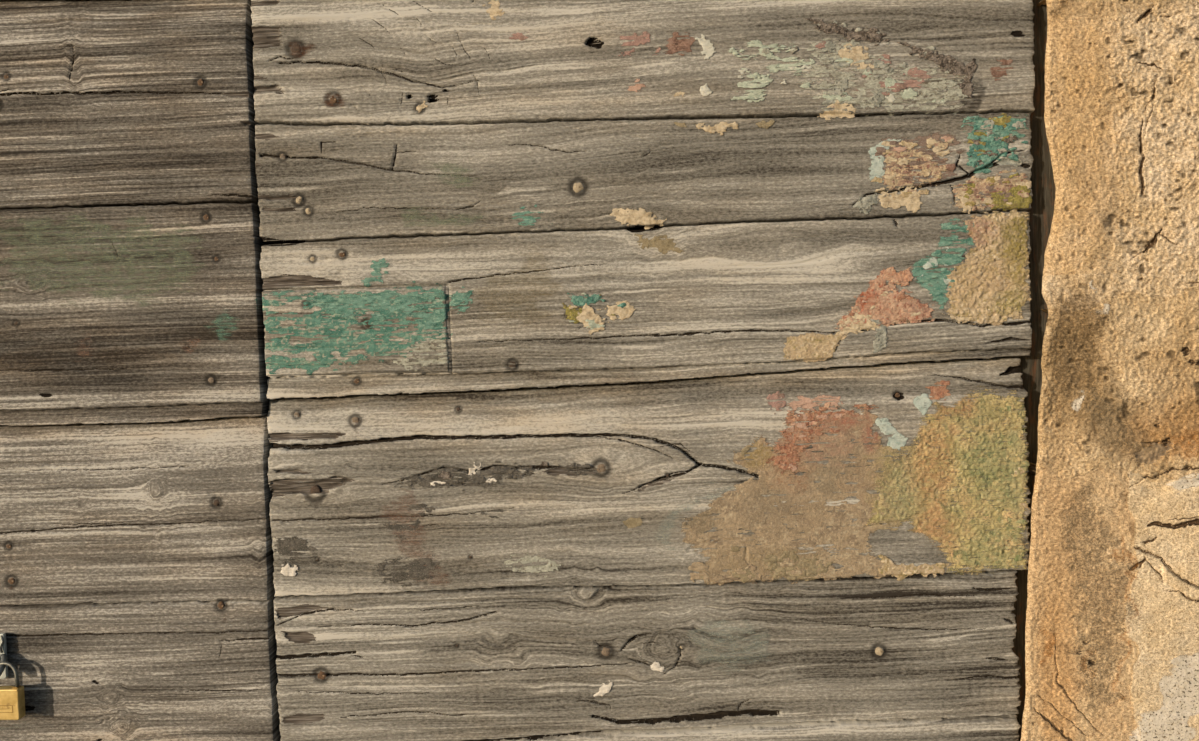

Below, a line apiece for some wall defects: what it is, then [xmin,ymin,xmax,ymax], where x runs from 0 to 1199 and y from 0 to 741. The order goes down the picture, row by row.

peeling [610,18,1032,363]
peeling [255,258,473,376]
peeling [562,293,636,335]
crack [0,433,759,534]
peeling [681,380,1030,586]
crack [1129,516,1199,602]
crack [6,606,779,741]